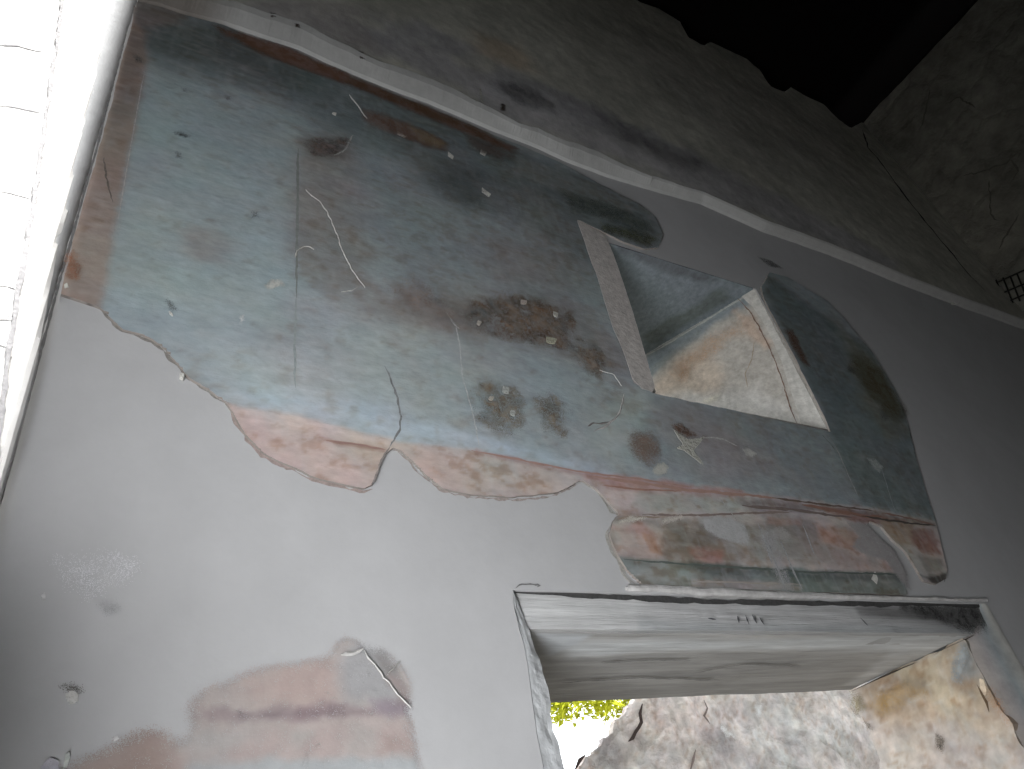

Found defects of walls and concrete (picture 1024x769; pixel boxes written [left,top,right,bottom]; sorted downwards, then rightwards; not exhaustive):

crack [306,190,365,292]
crack [863,132,971,277]
spalling [460,289,619,382]
spalling [465,380,573,438]
crack [102,297,980,608]
spalling [672,423,699,439]
peeling [702,516,750,546]
crack [341,648,411,708]